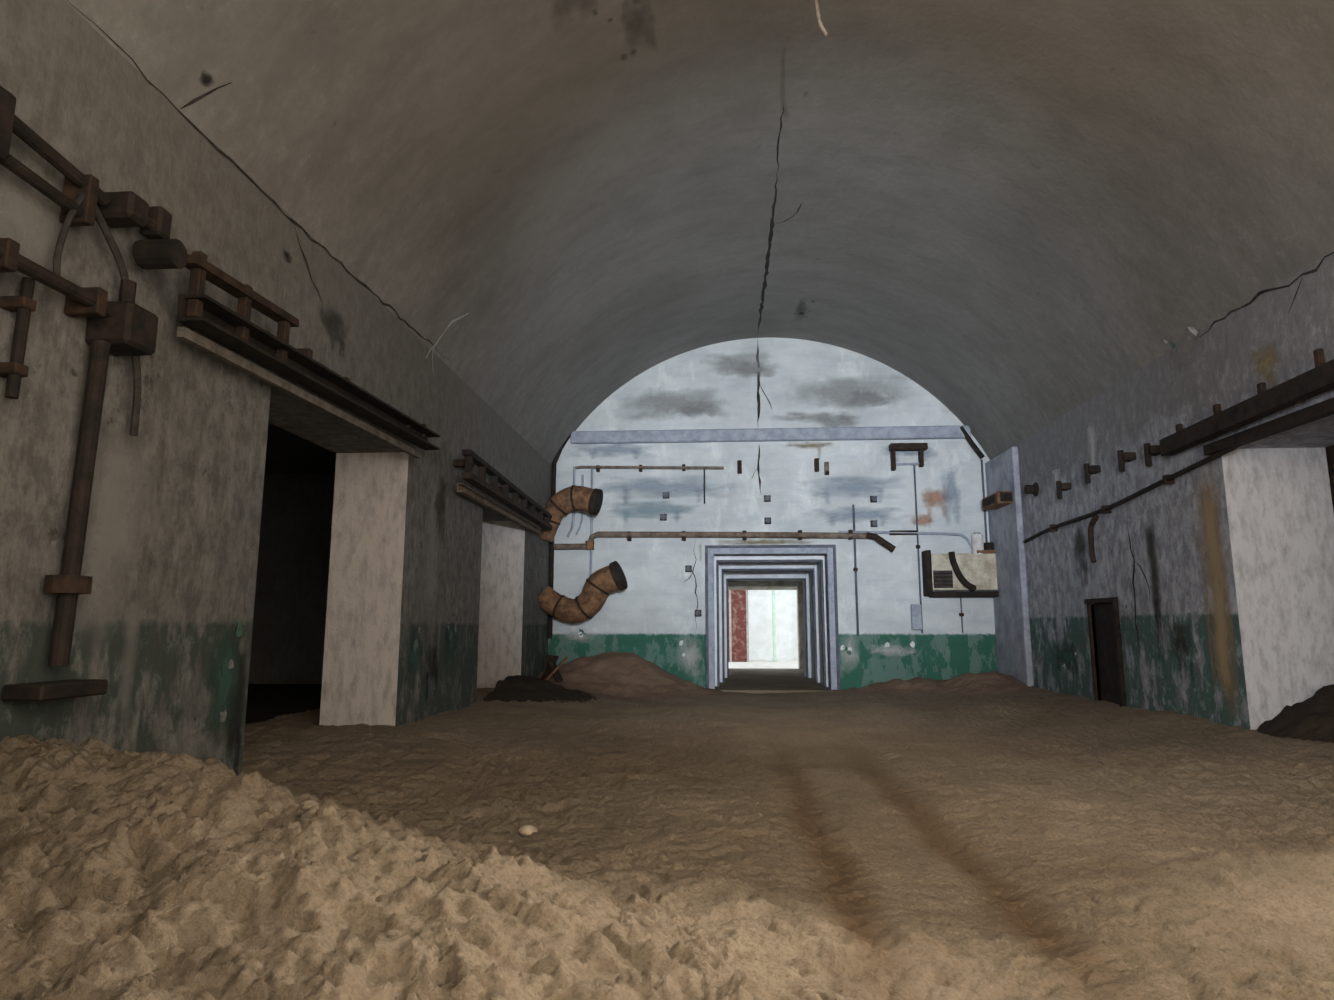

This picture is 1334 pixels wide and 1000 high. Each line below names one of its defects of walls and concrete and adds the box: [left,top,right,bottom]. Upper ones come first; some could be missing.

crack [752,108,802,493]
crack [1195,252,1334,339]